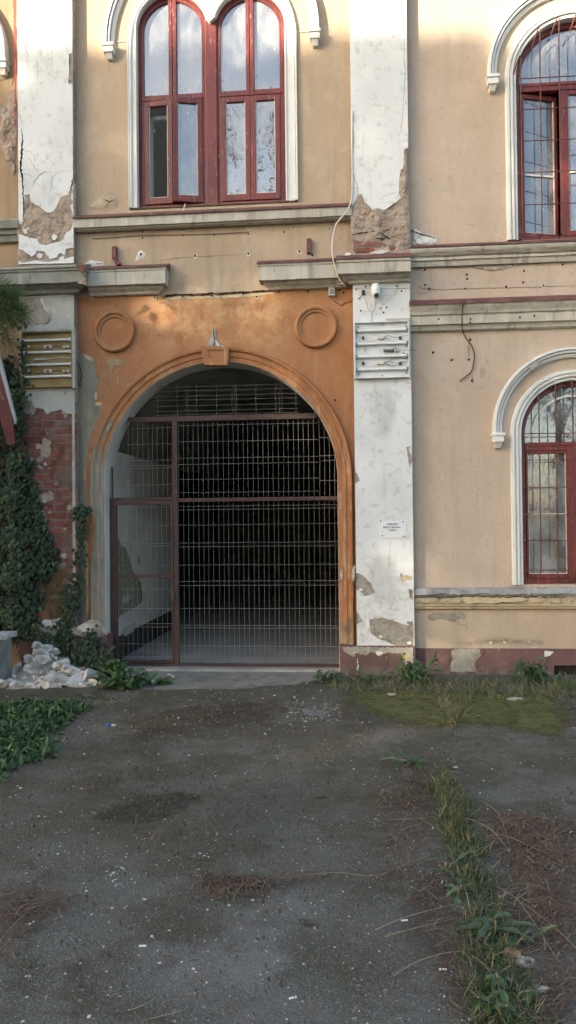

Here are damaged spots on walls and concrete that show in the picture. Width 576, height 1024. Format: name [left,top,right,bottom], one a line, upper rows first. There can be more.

spalling [0,89,17,175]
crack [20,117,75,247]
spalling [16,182,105,285]
spalling [333,148,437,258]
spalling [15,354,123,637]
spalling [343,612,414,671]
spalling [450,648,484,673]